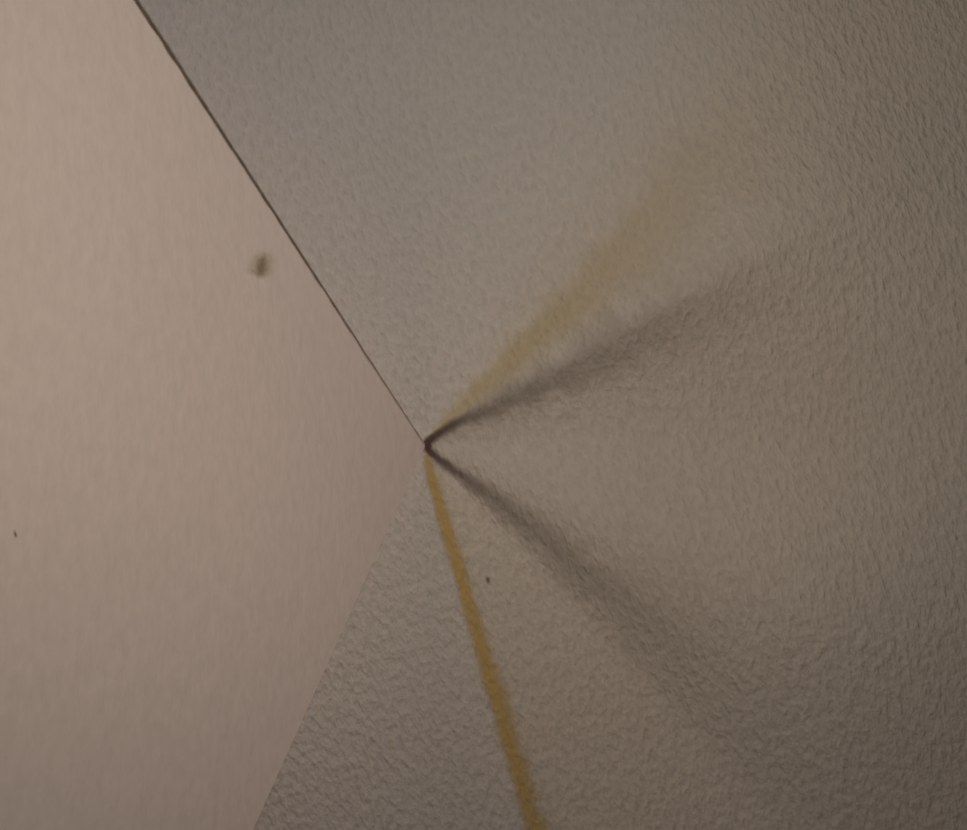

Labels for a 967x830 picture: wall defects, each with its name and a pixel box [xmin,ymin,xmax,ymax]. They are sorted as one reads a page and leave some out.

water stain [427,460,540,830]